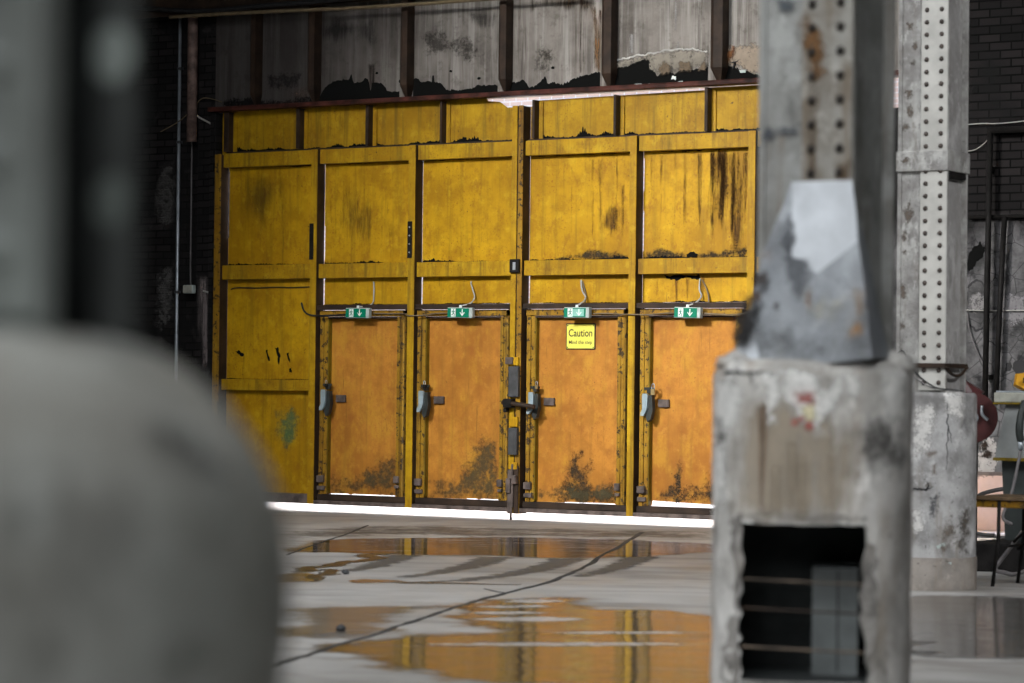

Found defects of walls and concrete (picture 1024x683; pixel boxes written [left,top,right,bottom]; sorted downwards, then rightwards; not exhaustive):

water stain [425,33,477,59]
flaking render [615,59,708,85]
peeling [763,368,861,429]
peeling [712,379,742,508]
crack [913,403,952,491]
crack [285,525,644,664]